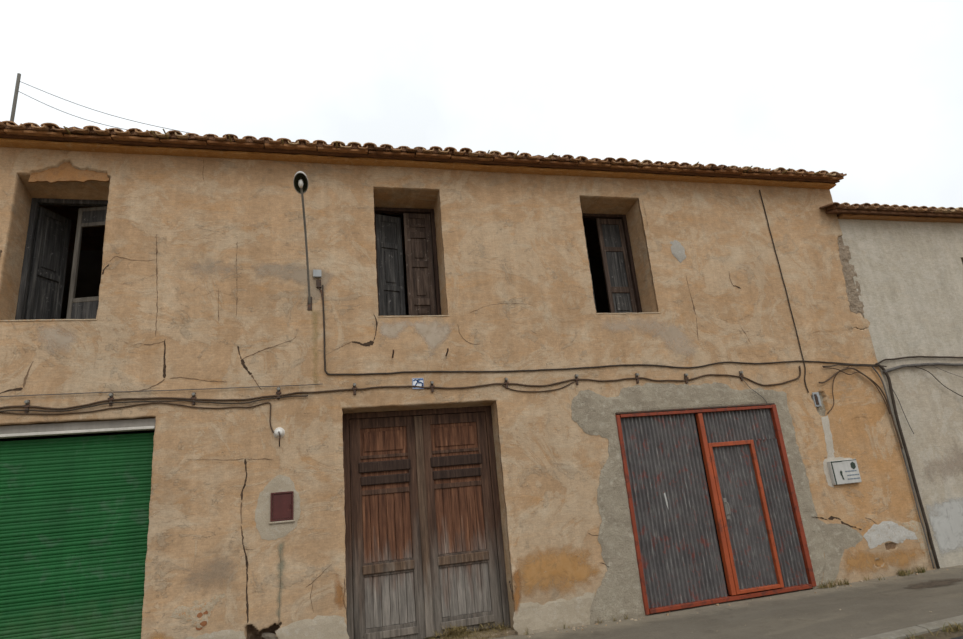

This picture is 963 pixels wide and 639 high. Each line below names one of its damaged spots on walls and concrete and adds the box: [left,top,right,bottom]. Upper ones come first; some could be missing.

crack [102,234,224,391]
crack [326,315,378,355]
crack [0,362,33,394]
crack [237,341,289,390]
crack [189,458,271,623]
peeling [863,520,931,553]
spalling [247,622,281,639]